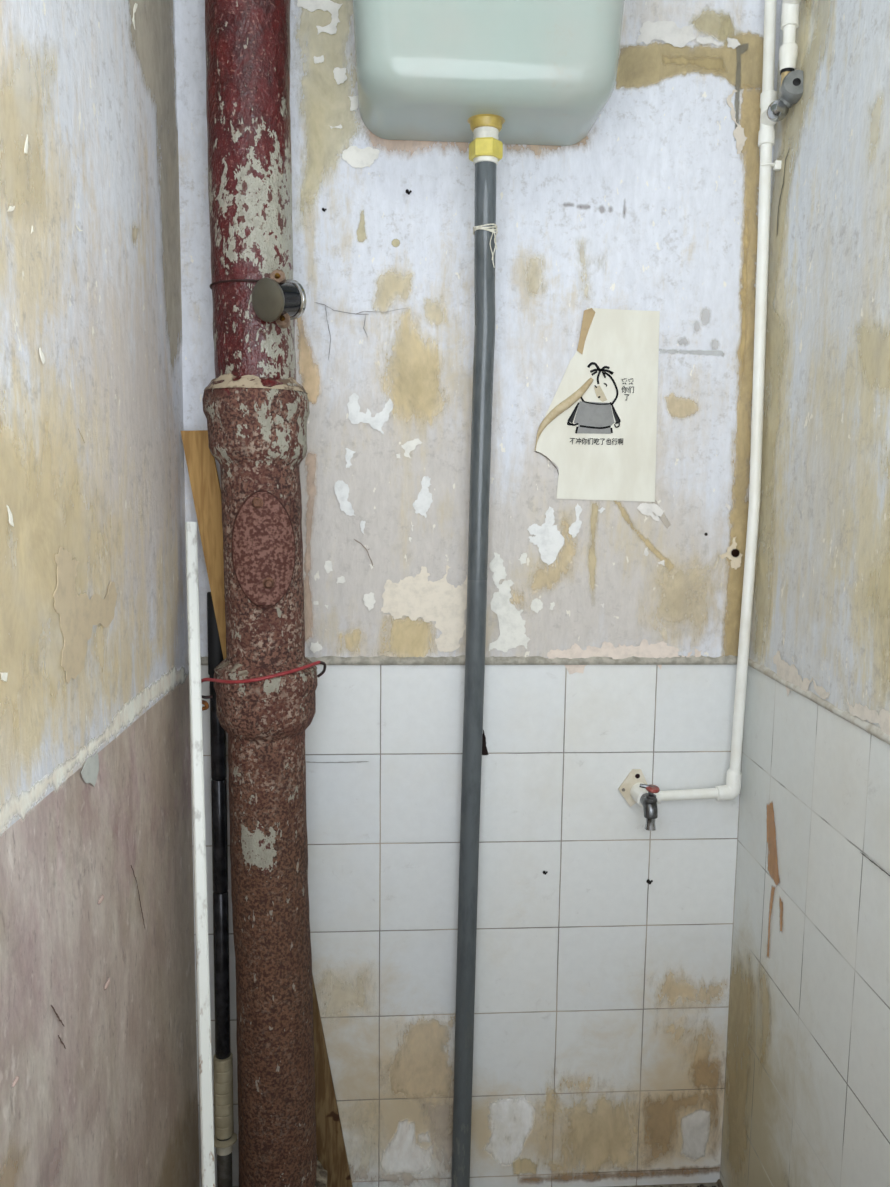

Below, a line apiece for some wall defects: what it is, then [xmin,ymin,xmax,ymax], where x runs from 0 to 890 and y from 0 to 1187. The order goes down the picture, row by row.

peeling [297,0,343,35]
peeling [636,21,741,49]
peeling [347,393,393,434]
peeling [518,503,582,565]
peeling [720,536,742,570]
peeling [363,565,467,653]
peeling [489,552,555,653]
peeling [547,639,702,674]
peeling [0,667,186,832]
corrosion [767,803,783,957]
leakage [390,1019,452,1167]
leakage [645,1032,718,1158]